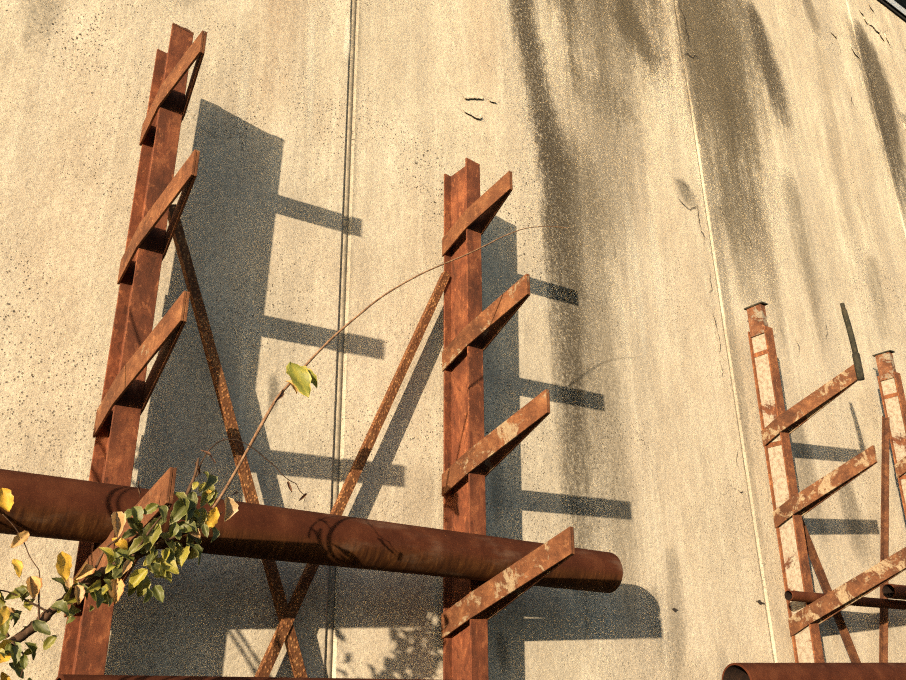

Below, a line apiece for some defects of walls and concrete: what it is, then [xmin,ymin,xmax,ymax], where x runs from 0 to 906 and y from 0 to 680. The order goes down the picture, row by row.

water stain [563,0,656,81]
water stain [680,0,788,222]
water stain [856,23,906,199]
water stain [510,0,588,548]